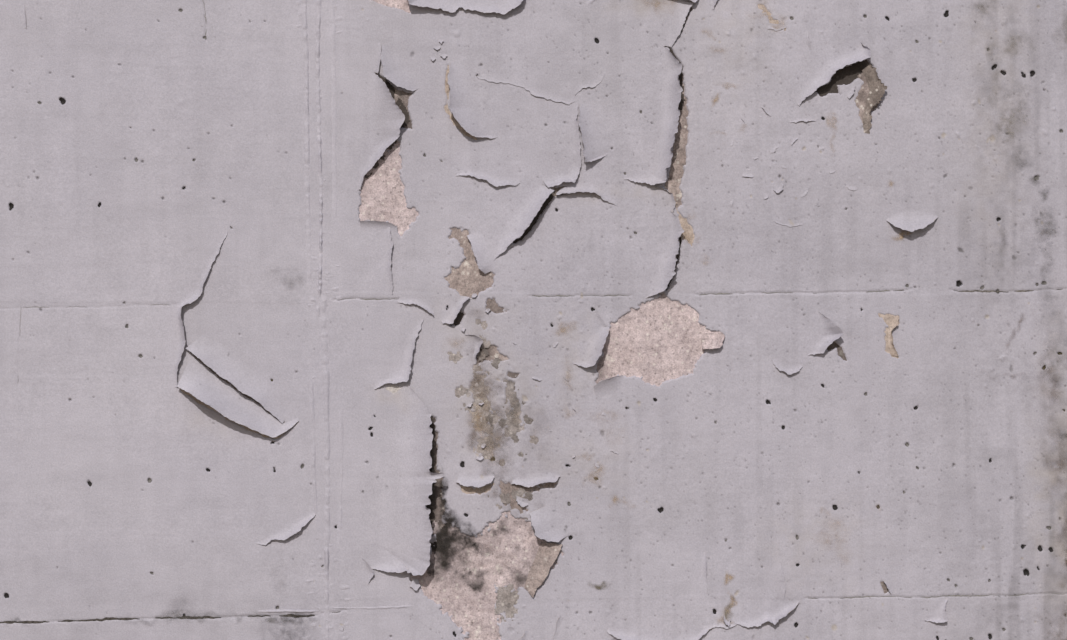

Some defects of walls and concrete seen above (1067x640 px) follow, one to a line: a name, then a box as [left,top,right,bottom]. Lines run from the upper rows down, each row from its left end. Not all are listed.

peeling [369,0,523,15]
peeling [790,41,887,134]
peeling [571,0,725,399]
peeling [887,210,938,232]
peeling [172,231,299,442]
peeling [358,40,618,640]
peeling [770,312,847,375]
spalling [878,313,900,358]
peeling [256,512,316,545]
leakage [428,481,478,574]
peeling [607,600,799,640]